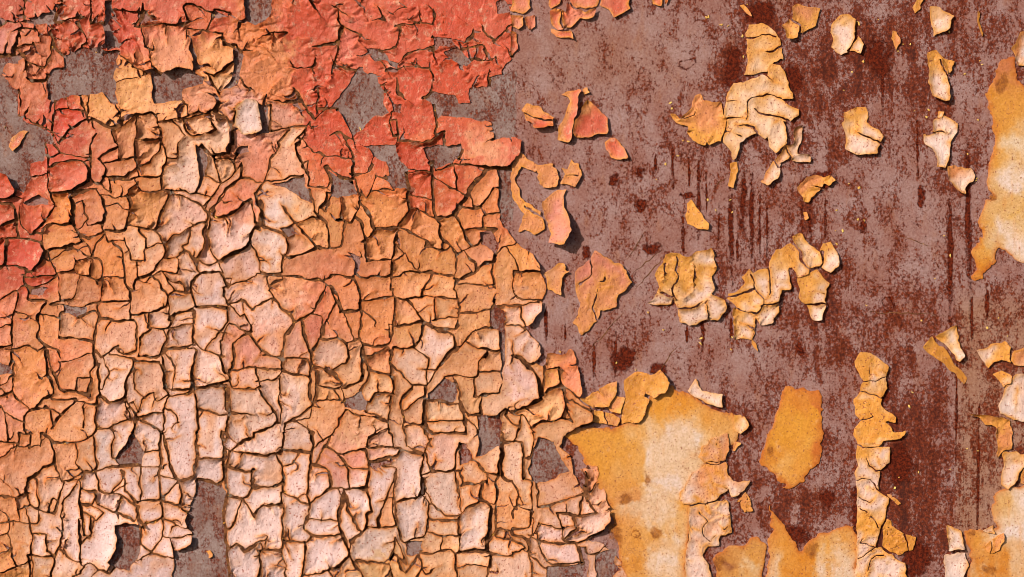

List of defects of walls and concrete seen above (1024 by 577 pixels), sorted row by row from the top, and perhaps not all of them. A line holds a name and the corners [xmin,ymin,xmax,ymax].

rust [746,1,775,25]
peeling [670,4,820,188]
crack [0,0,607,577]
peeling [0,0,669,577]
rust [610,332,636,372]
peeling [679,415,753,577]
rust [671,148,769,286]
peeling [648,233,839,351]
peeling [853,352,916,577]
rust [901,540,931,577]
rust [946,182,990,340]
peeling [923,325,1024,489]